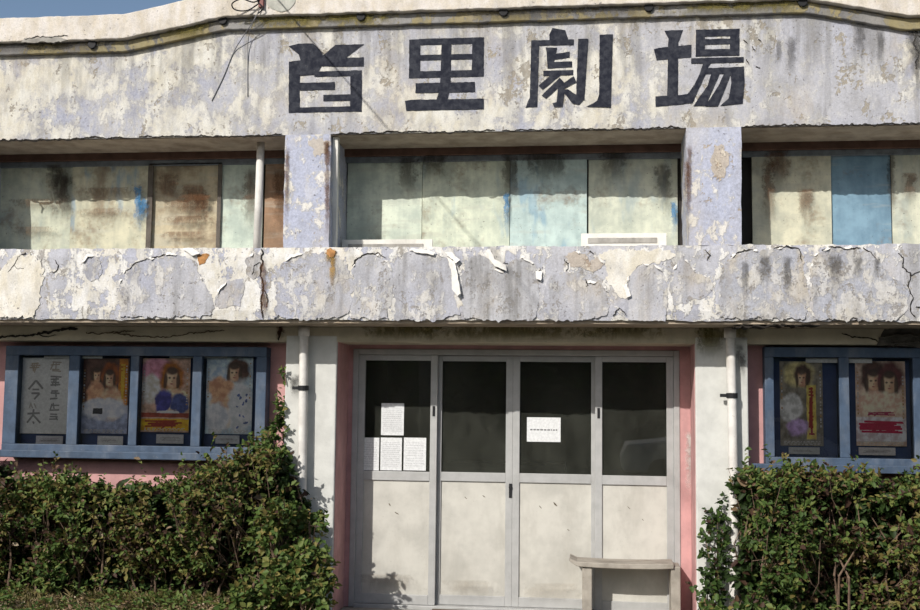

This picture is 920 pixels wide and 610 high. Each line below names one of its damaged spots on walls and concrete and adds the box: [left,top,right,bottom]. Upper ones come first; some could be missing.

peeling [710,144,730,182]
peeling [0,253,45,319]
peeling [81,254,102,281]
peeling [117,248,261,319]
crack [252,249,283,340]
corrosion [326,248,336,275]
peeling [274,245,920,348]
crack [775,245,875,260]
crack [898,253,920,317]
crack [0,327,225,339]